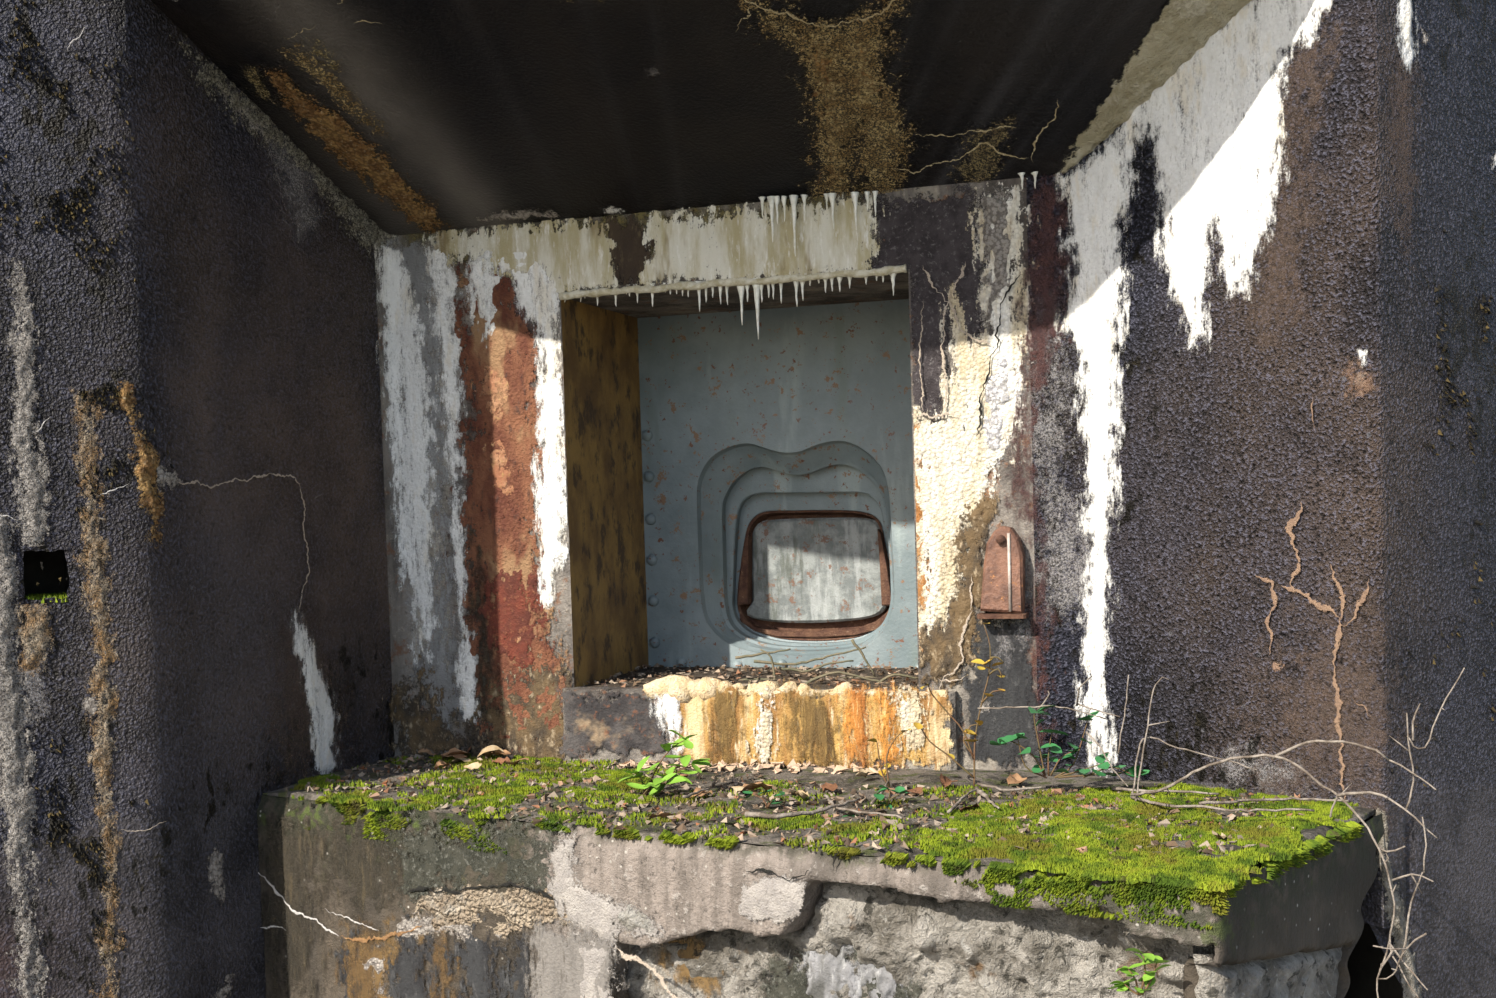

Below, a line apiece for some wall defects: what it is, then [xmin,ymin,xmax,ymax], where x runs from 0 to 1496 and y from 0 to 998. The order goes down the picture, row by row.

crack [270,0,381,39]
leakage [0,257,53,998]
leakage [69,387,128,998]
crack [300,489,325,605]
rust [446,250,954,771]
leakage [169,0,1340,776]
spalling [395,830,1342,998]